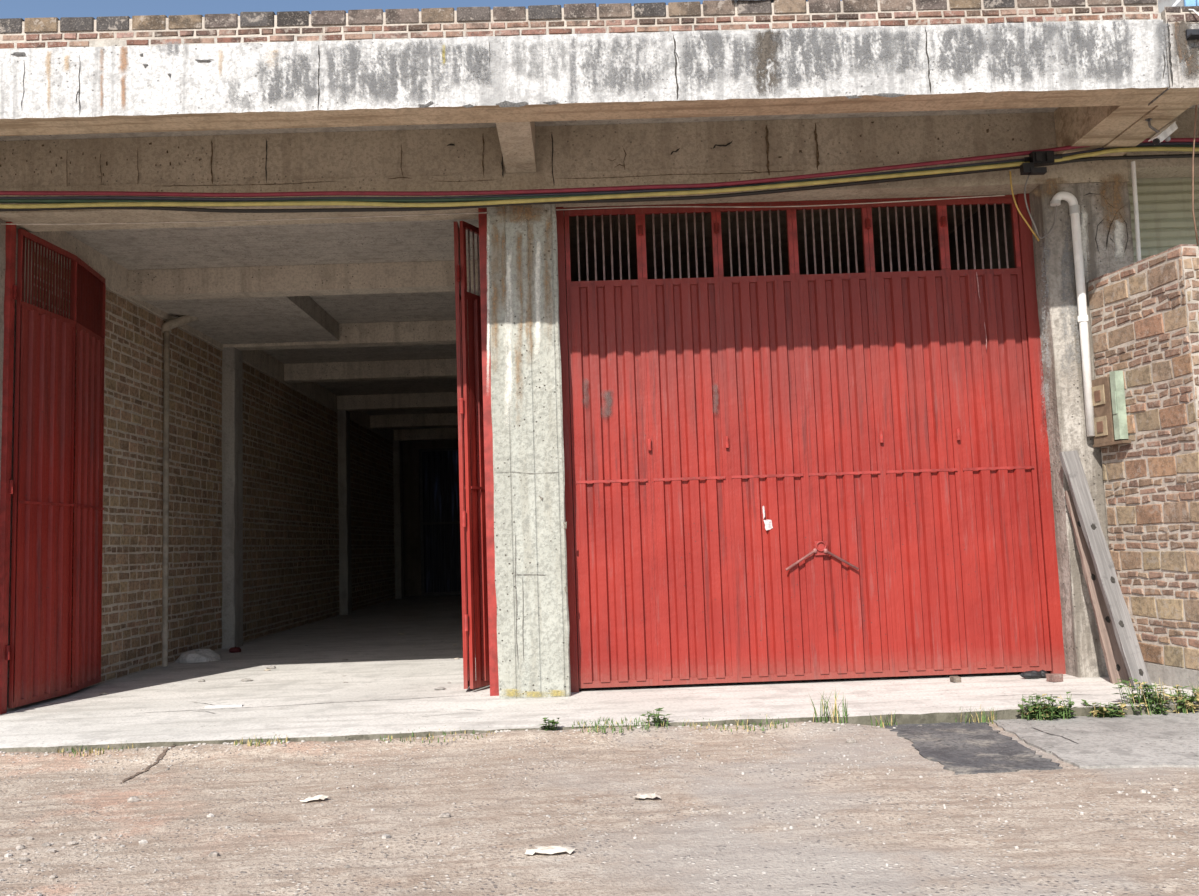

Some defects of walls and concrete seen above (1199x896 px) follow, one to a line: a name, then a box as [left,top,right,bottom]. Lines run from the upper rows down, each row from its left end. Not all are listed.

damp [228,39,489,107]
crack [672,35,680,99]
damp [503,27,920,94]